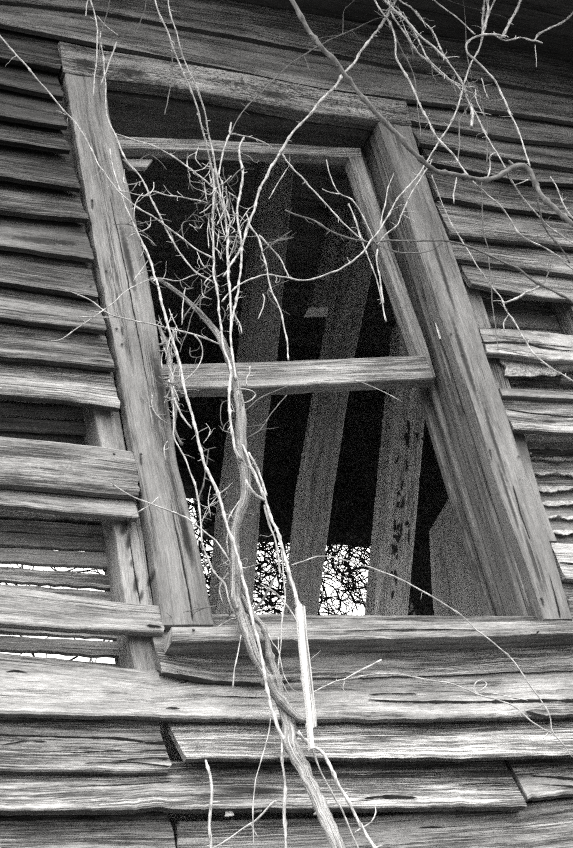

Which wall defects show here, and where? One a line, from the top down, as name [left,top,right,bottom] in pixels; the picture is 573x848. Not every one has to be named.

crack [368,693,573,727]